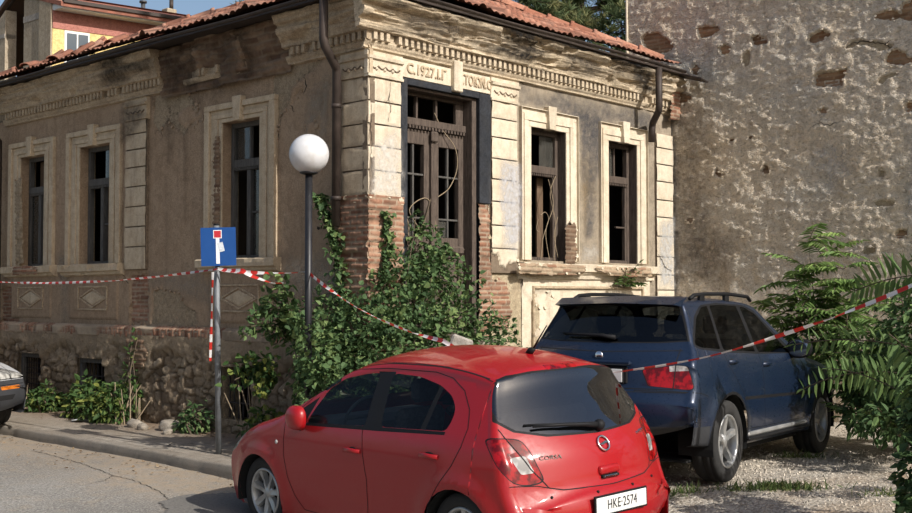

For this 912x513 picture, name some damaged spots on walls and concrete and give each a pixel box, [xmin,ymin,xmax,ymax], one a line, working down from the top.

spalling [874,1,912,21]
spalling [643,31,675,54]
spalling [695,24,731,55]
spalling [740,33,767,68]
spalling [808,28,832,43]
spalling [816,66,847,87]
spalling [843,39,912,84]
flaking render [211,136,221,228]
flaking render [337,194,405,358]
flaking render [478,203,653,347]